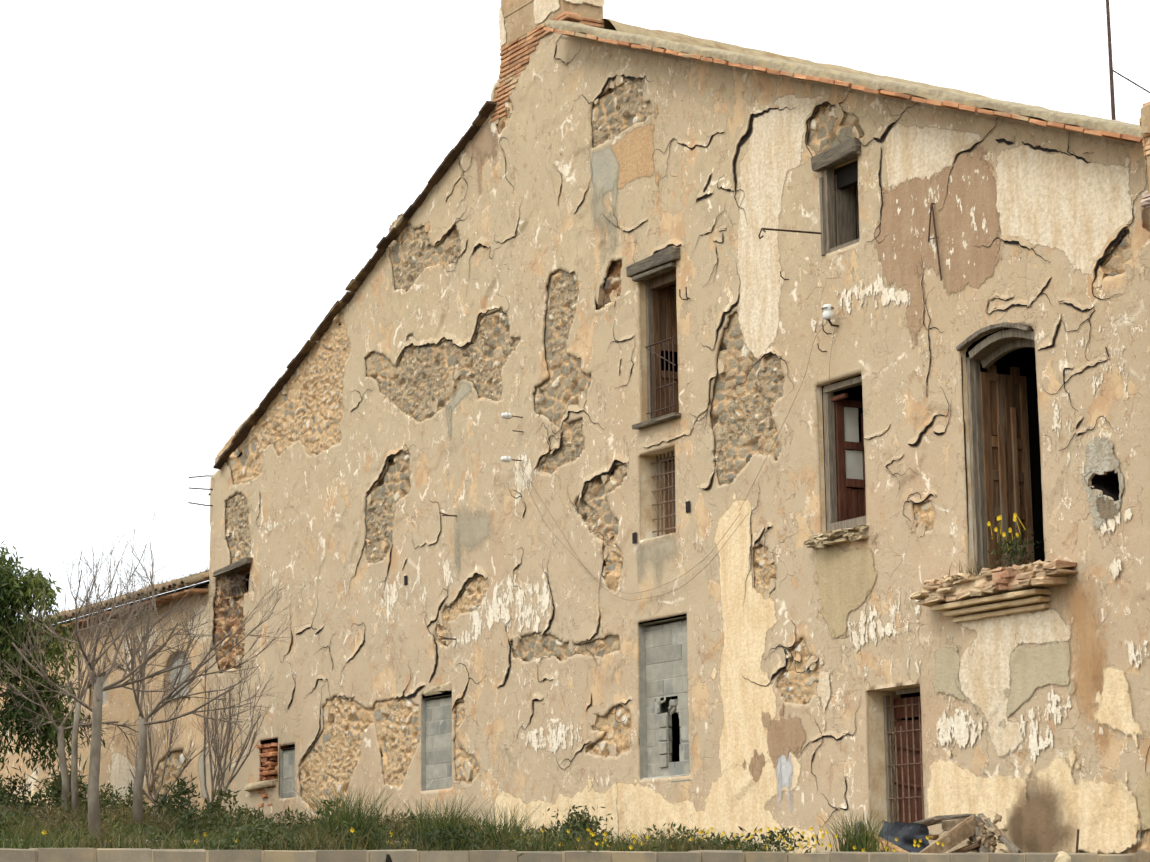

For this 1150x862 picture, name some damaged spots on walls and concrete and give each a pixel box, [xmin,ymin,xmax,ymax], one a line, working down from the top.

flaking render [389,213,461,292]
flaking render [365,310,521,422]
crack [395,137,522,367]
crack [555,90,852,510]
crack [845,102,919,244]
crack [938,117,1093,211]
crack [980,173,1147,451]
flaking render [183,313,351,671]
flaking render [271,451,621,662]
crack [387,547,554,739]
flaking render [494,94,1150,854]
flaking render [244,696,420,813]